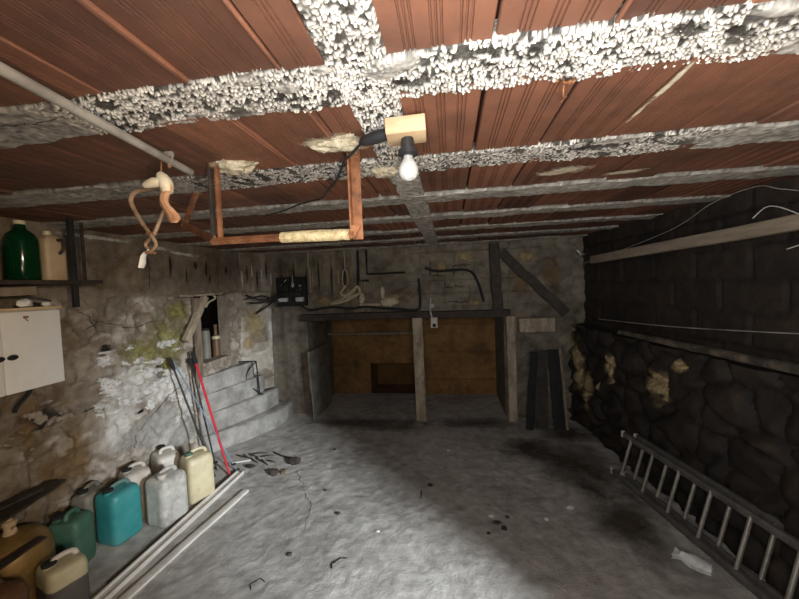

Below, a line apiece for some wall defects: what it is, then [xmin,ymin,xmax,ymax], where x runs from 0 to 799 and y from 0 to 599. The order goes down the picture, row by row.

flaking render [93,338,186,421]